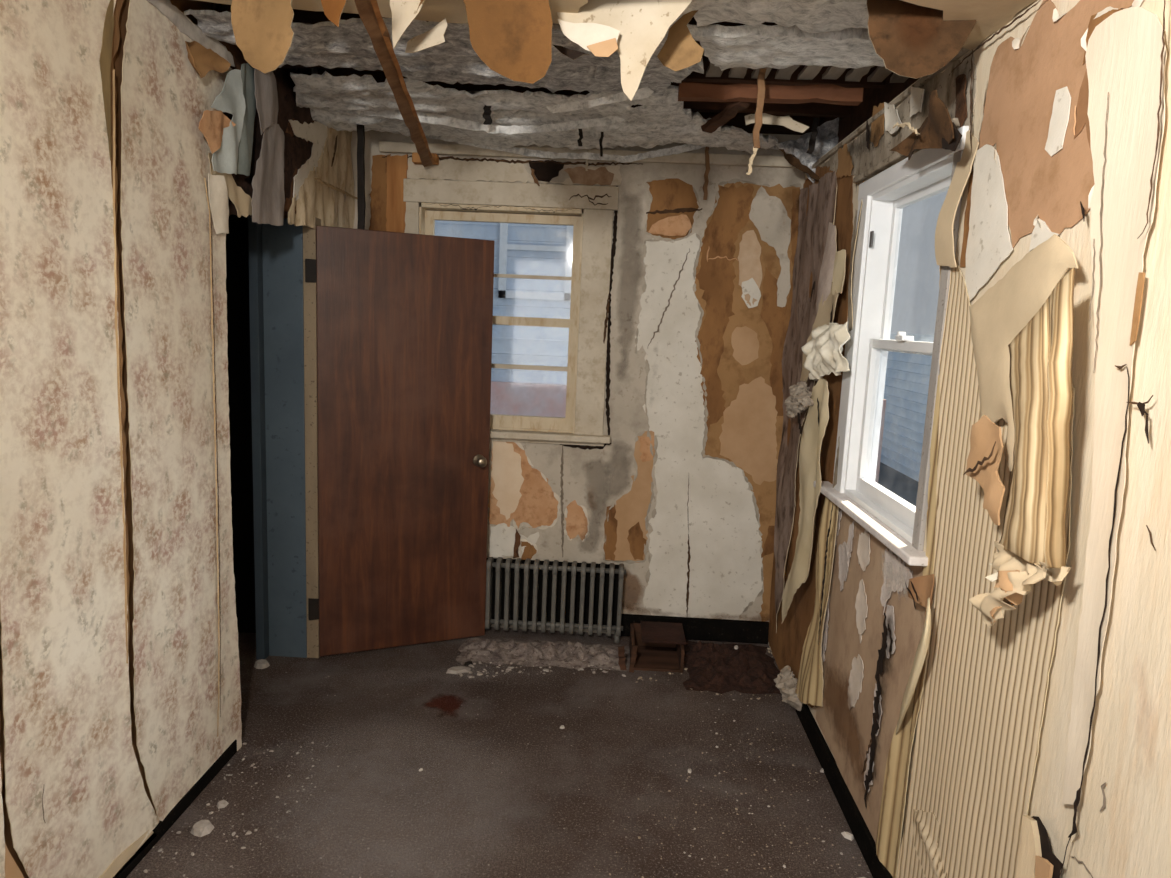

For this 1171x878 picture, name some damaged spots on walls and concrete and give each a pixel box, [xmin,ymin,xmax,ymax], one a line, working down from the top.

peeling [820,0,1143,301]
peeling [487,441,590,560]
flaking render [603,177,803,622]
crack [1060,92,1153,878]
peeling [816,508,932,843]